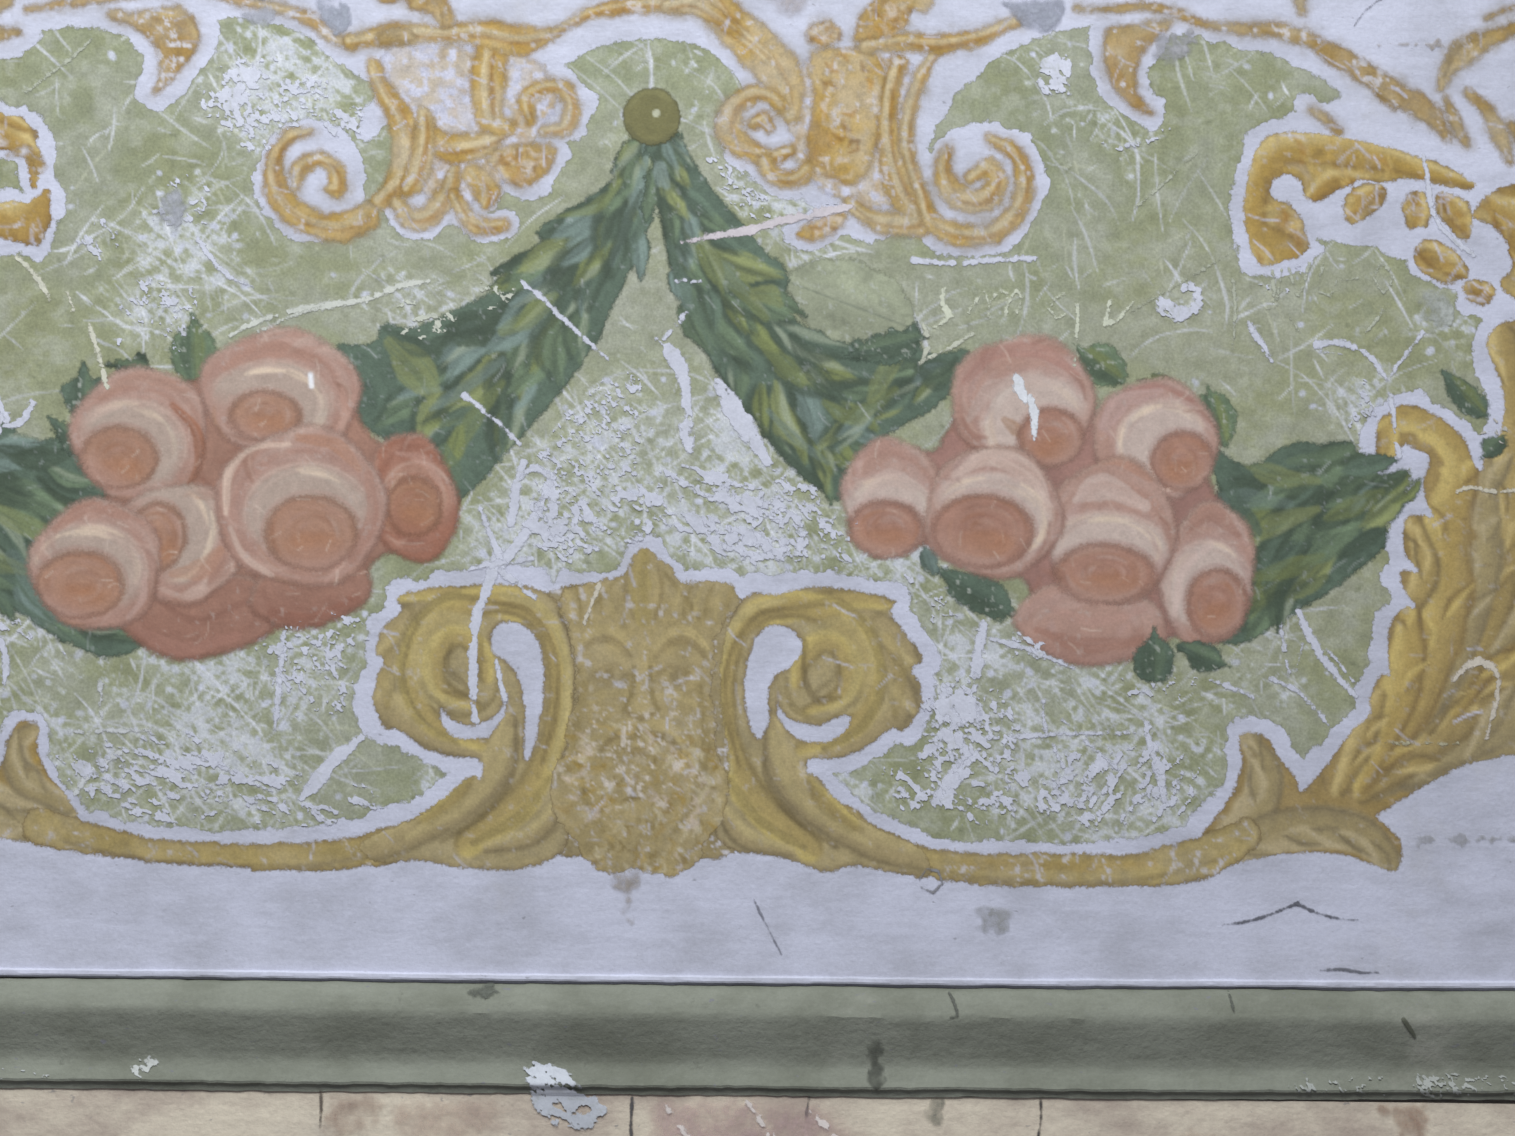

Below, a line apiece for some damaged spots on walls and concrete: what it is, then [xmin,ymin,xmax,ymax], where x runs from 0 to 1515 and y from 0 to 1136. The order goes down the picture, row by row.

peeling [522,372,852,568]
peeling [0,618,33,640]
peeling [255,612,369,716]
peeling [1012,632,1046,660]
peeling [55,729,384,826]
peeling [870,672,1200,830]
crack [1233,901,1355,924]
flaking render [523,1061,607,1130]